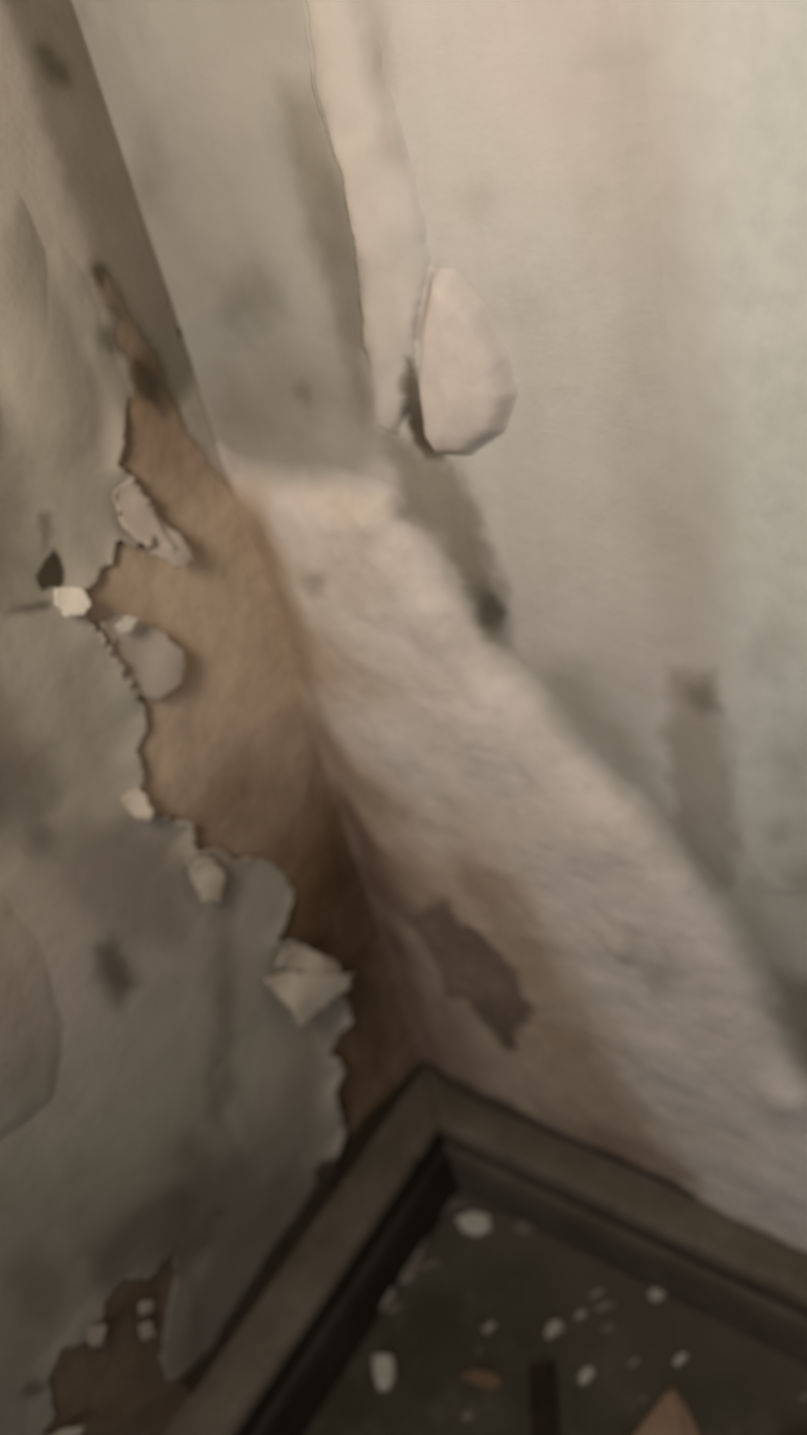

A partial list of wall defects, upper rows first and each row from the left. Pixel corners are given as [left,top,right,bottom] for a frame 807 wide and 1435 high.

peeling [305,0,432,436]
flaking render [0,241,424,1188]
leakage [216,441,807,1252]
flaking render [27,1234,202,1435]